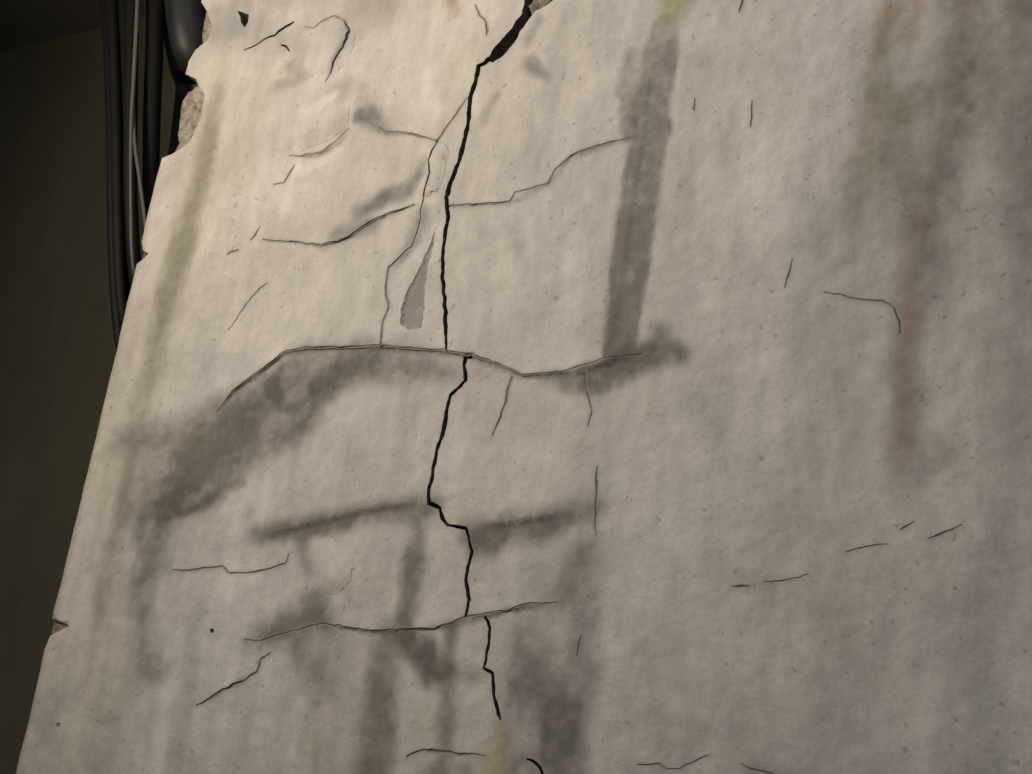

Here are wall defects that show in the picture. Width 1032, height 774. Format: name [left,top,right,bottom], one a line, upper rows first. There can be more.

spalling [202,12,212,43]
spalling [175,86,205,152]
damp [566,44,683,391]
crack [196,0,642,720]
damp [156,349,383,505]
damp [259,511,360,541]
damp [467,516,572,551]
crack [172,553,289,574]
damp [398,550,451,680]
crack [406,748,485,757]
crack [526,758,544,774]
crack [637,755,708,770]